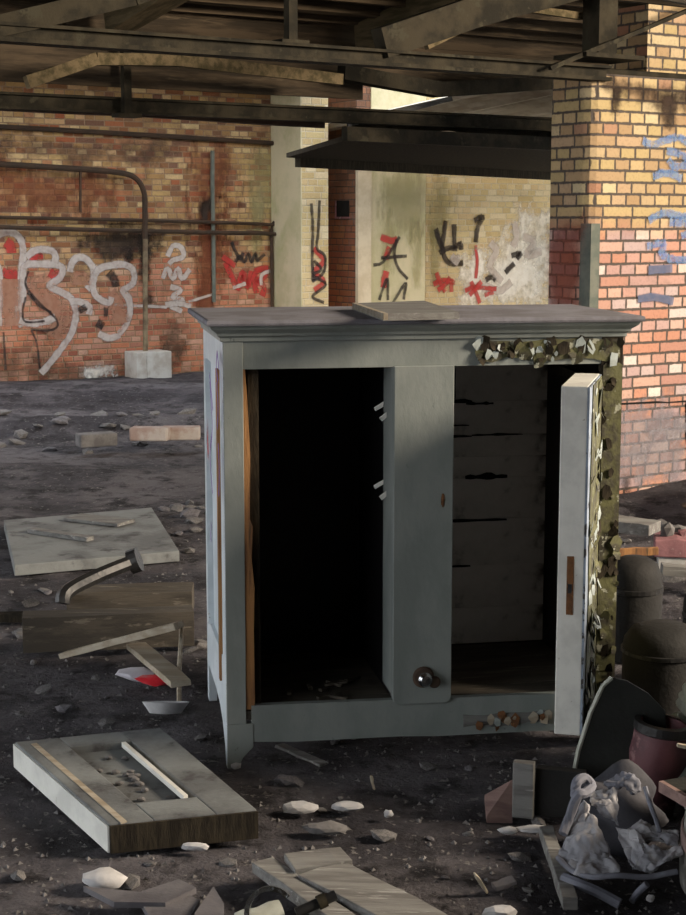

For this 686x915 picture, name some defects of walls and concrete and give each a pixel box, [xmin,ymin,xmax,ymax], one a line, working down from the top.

damp [662,96,677,129]
peeling [459,208,550,305]